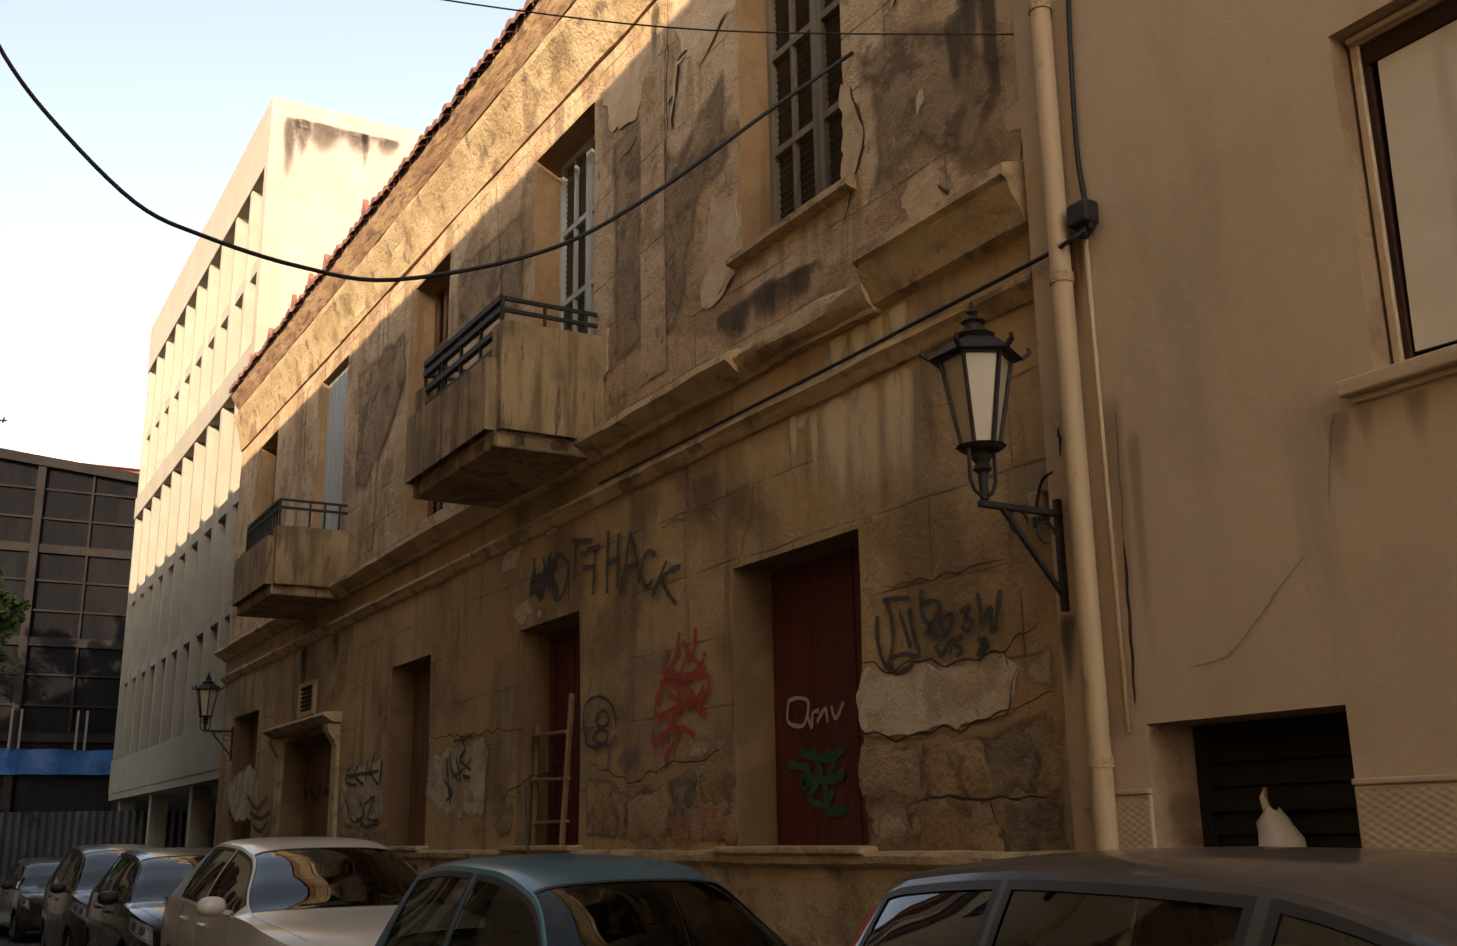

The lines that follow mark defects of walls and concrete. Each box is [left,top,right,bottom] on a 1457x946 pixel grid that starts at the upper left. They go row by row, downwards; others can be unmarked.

damp [285,118,398,157]
damp [717,263,814,333]
crack [1189,554,1306,668]
spalling [858,714,1070,852]